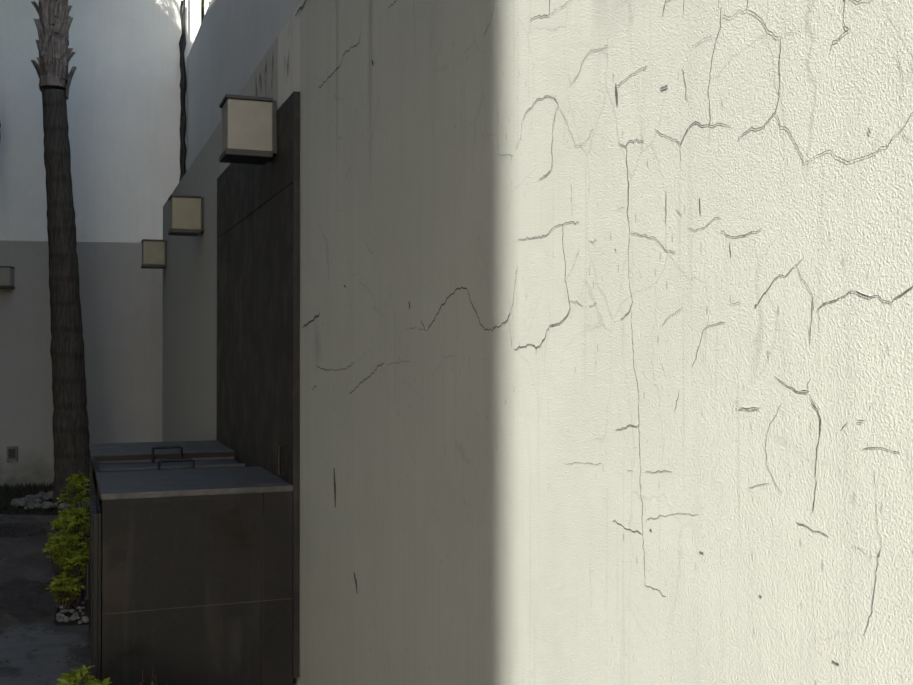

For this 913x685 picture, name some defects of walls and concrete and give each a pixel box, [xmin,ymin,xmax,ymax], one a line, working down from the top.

crack [500,45,608,180]
crack [412,190,597,350]
crack [614,0,913,597]
crack [312,361,408,393]
crack [853,513,882,634]